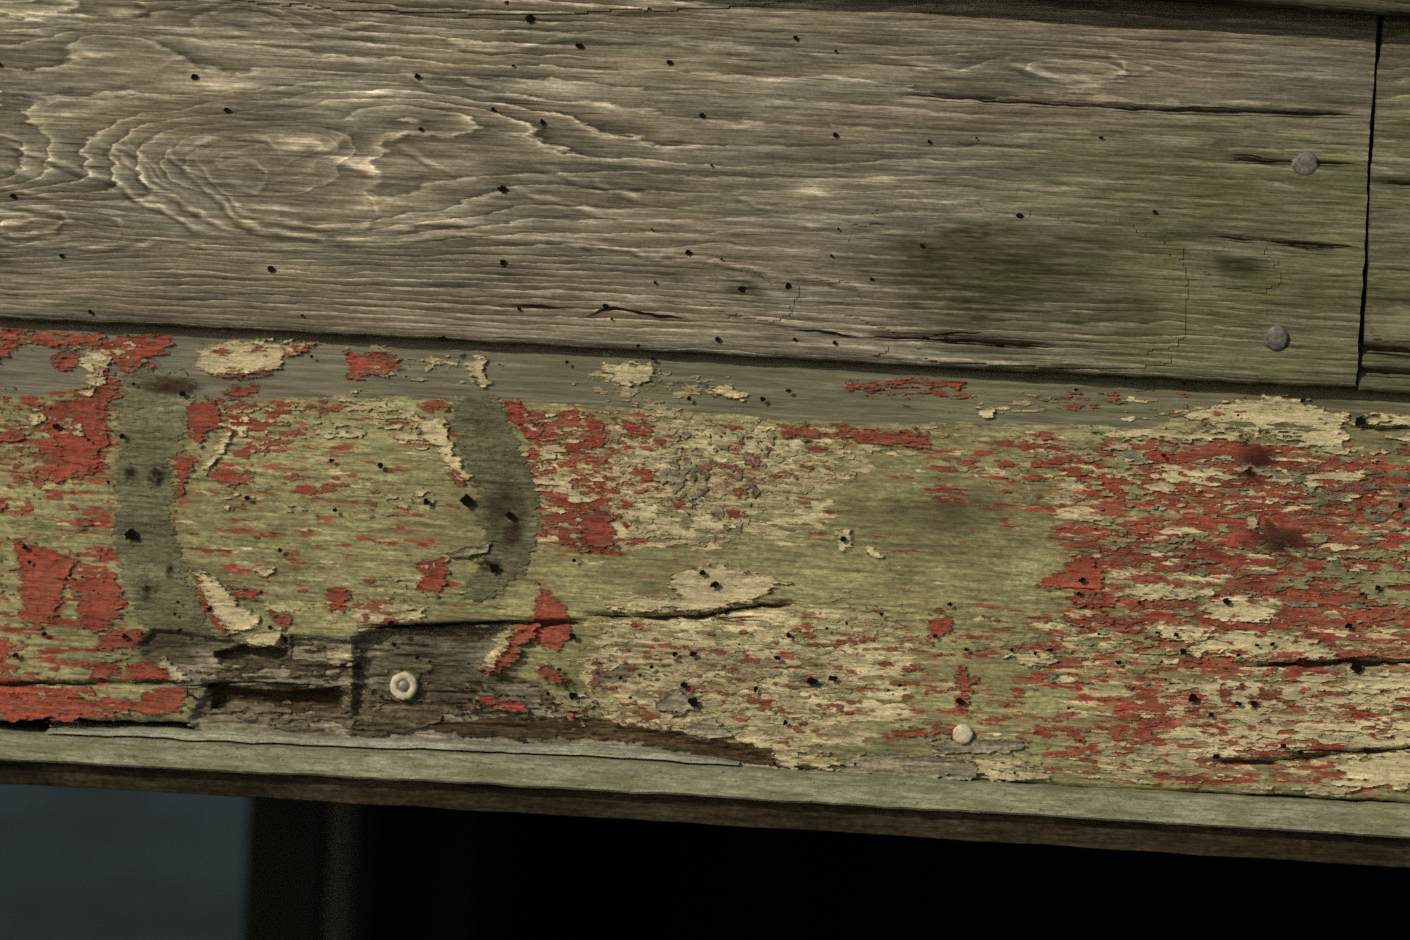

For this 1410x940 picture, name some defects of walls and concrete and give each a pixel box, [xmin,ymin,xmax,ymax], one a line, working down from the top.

peeling [0,326,175,530]
peeling [172,338,504,531]
peeling [0,536,344,727]
peeling [191,542,492,668]
peeling [378,664,440,696]
crack [356,603,801,629]
peeling [420,349,1410,797]
crack [1243,660,1410,674]